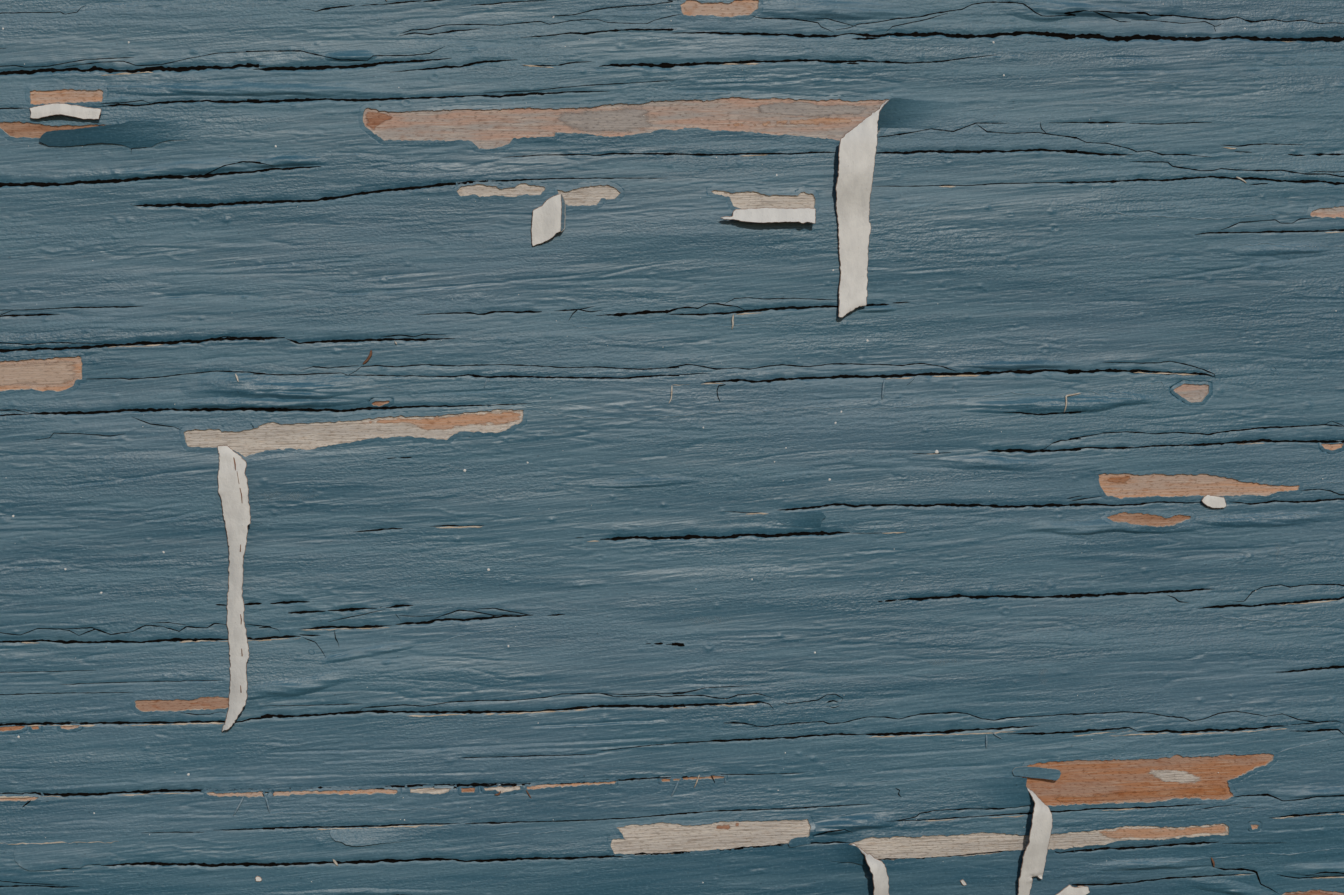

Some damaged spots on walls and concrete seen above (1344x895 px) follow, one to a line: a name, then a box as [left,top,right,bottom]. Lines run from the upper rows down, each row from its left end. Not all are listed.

crack [0,0,1344,107]
peeling [0,85,203,148]
crack [0,147,834,208]
peeling [357,91,970,318]
crack [876,121,1344,187]
peeling [0,352,87,396]
crack [0,297,1215,440]
peeling [1094,469,1303,531]
peeling [130,397,528,732]
crack [0,601,1344,798]
crack [0,804,1020,895]
peeling [606,749,1278,895]